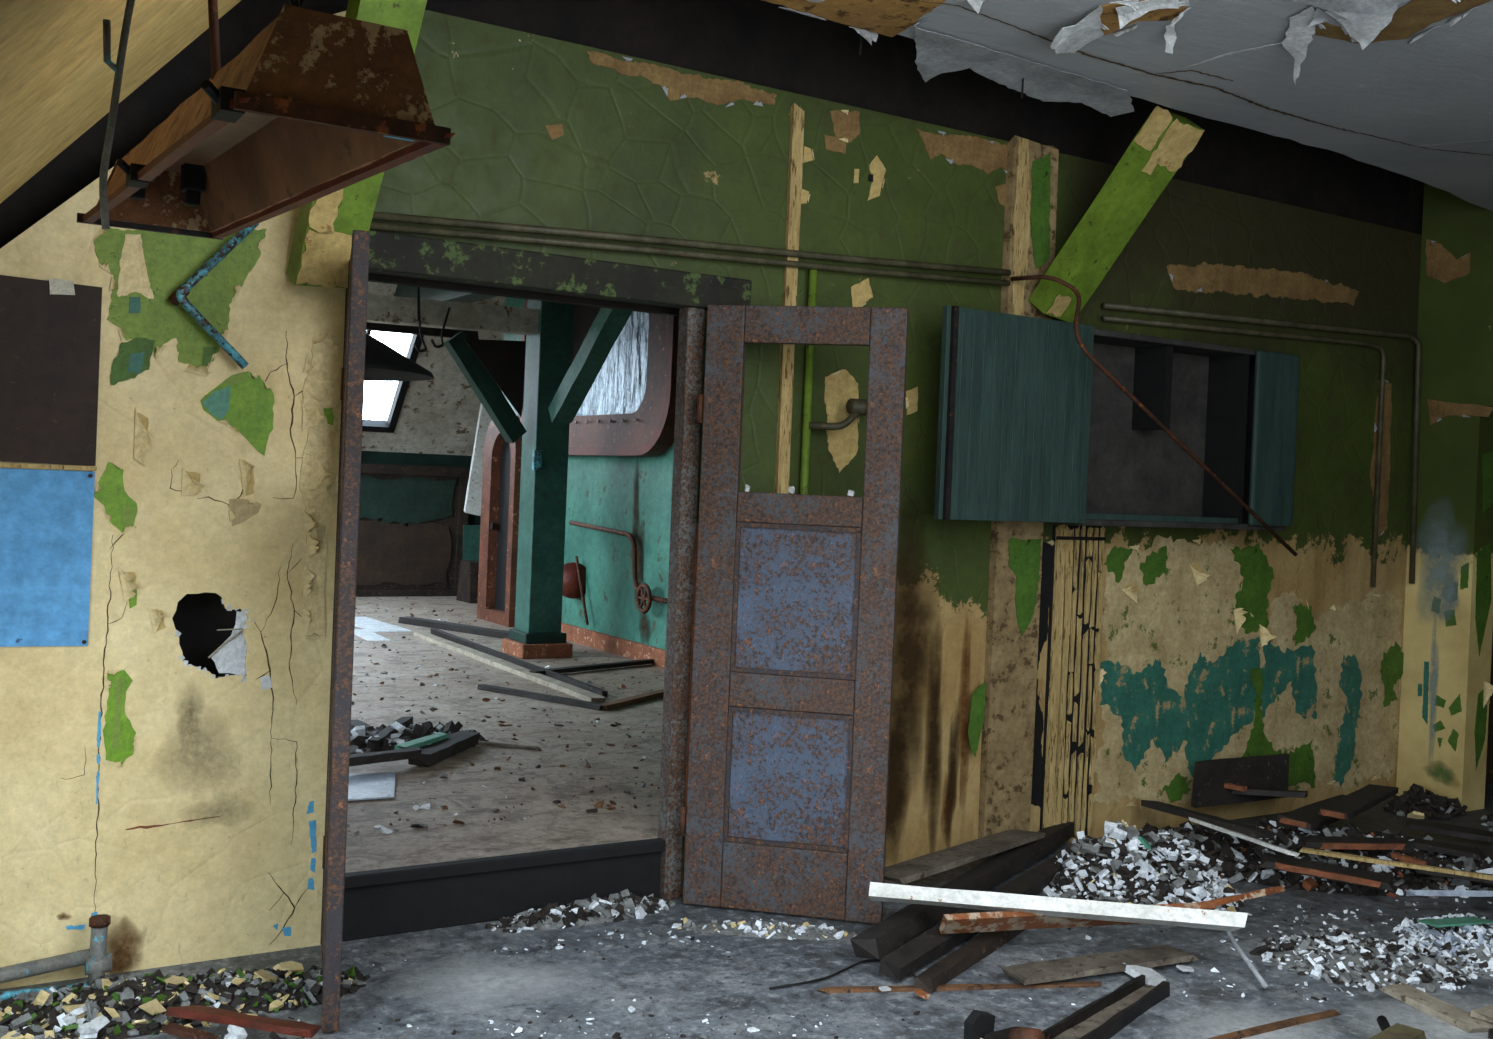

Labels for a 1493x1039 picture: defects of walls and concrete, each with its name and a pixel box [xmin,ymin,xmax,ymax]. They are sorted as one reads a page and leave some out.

flaking render [917,129,1008,206]
peeling [904,0,1204,175]
peeling [1281,0,1409,86]
peeling [92,228,275,535]
crack [62,534,127,910]
peeling [95,669,137,804]
crack [171,816,221,824]
spalling [178,599,272,689]
crack [254,545,302,843]
water stain [886,546,970,842]
peeling [1031,524,1493,841]
crack [268,872,305,945]